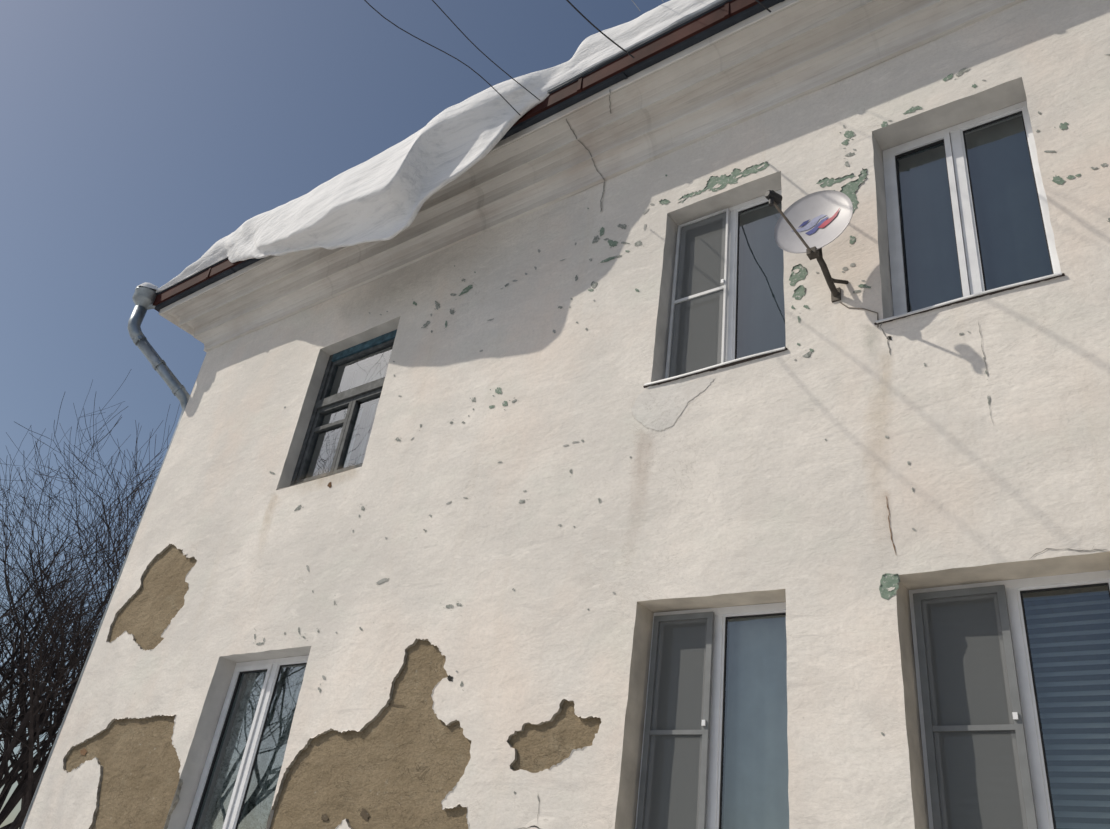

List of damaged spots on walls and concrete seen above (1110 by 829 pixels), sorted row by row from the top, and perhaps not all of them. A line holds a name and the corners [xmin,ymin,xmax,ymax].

crack [566,119,605,212]
peeling [589,162,769,263]
peeling [816,125,868,212]
spalling [107,545,197,651]
spalling [66,714,181,829]
spalling [269,639,471,829]
spalling [509,700,601,773]